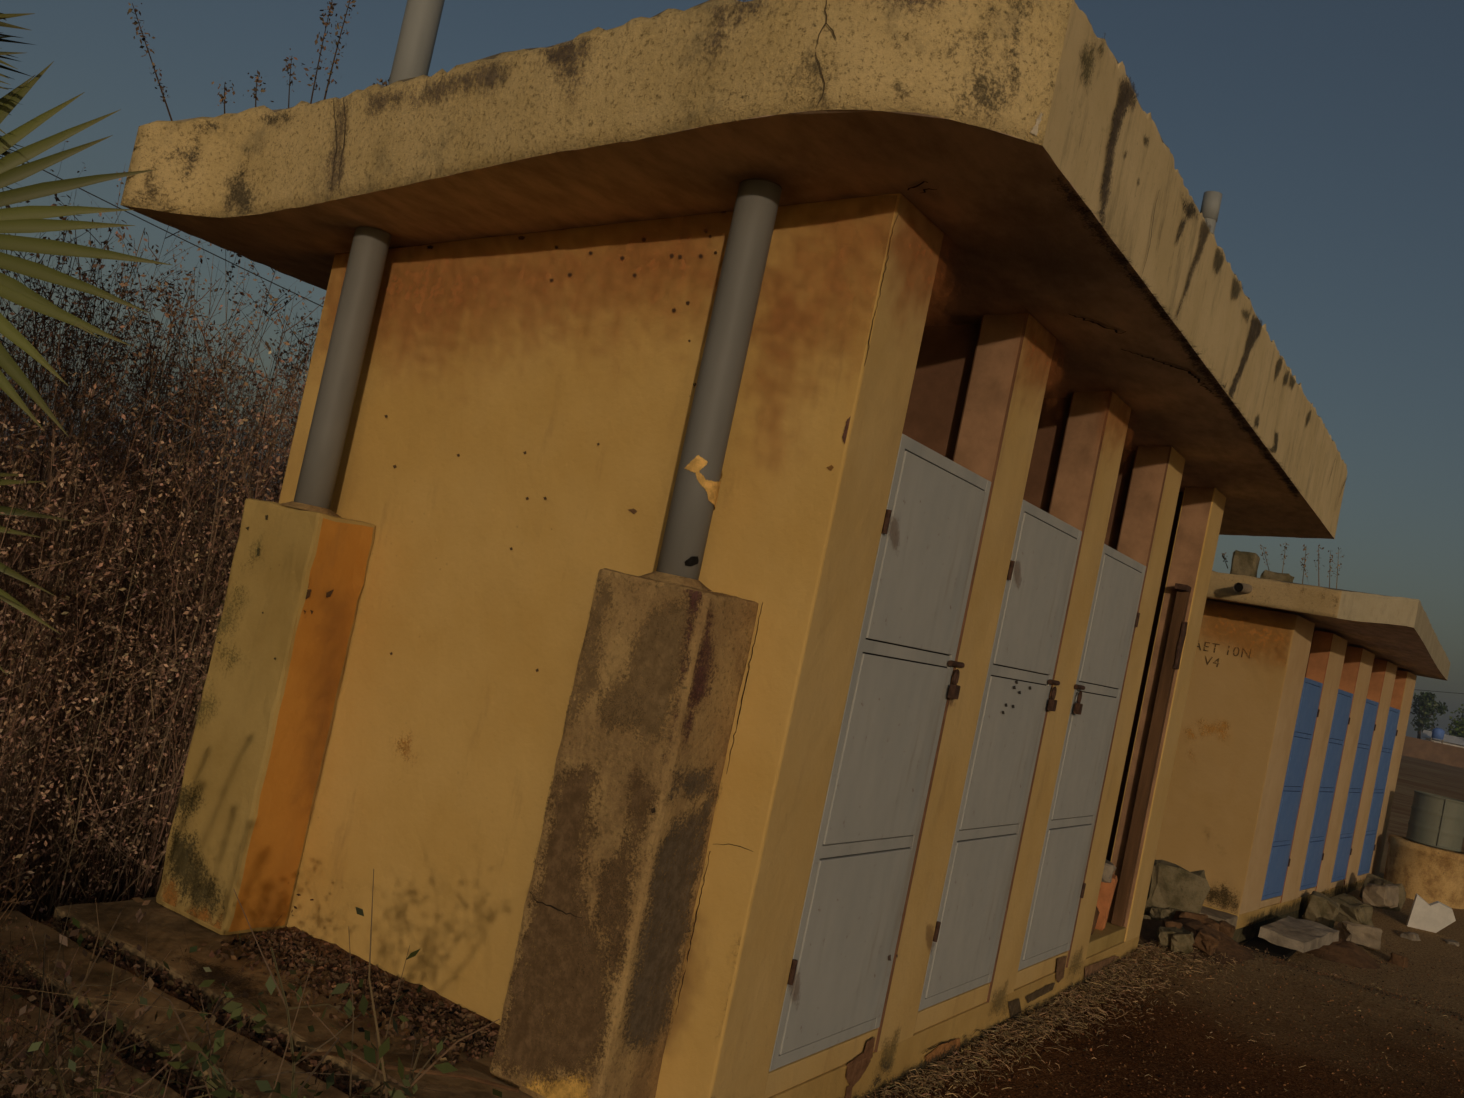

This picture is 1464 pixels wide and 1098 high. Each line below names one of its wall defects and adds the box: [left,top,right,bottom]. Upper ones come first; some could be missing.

leakage [368,61,507,114]
leakage [545,36,591,94]
crack [815,0,836,108]
leakage [962,28,1019,116]
leakage [1081,36,1105,84]
leakage [1057,77,1300,498]
leakage [168,786,224,916]
leakage [619,765,719,1051]